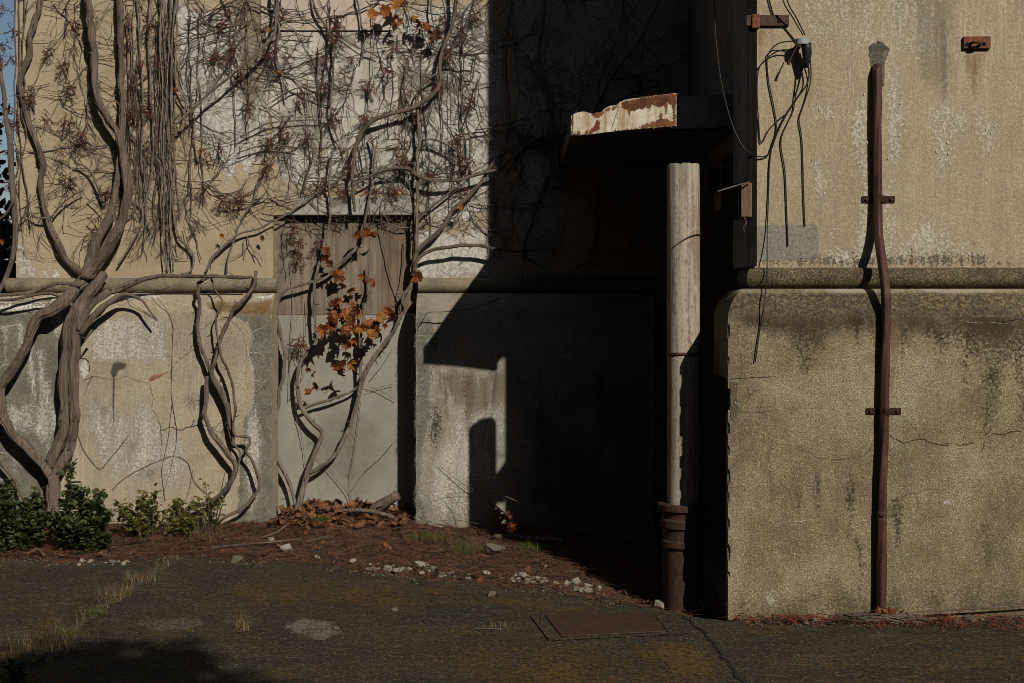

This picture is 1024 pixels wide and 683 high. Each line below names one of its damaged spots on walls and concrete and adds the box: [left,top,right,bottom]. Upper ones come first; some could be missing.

rust [571,93,677,137]
damp [758,242,1010,268]
damp [899,310,1024,434]
crack [82,376,226,457]
damp [419,375,504,520]
crack [768,424,1021,478]